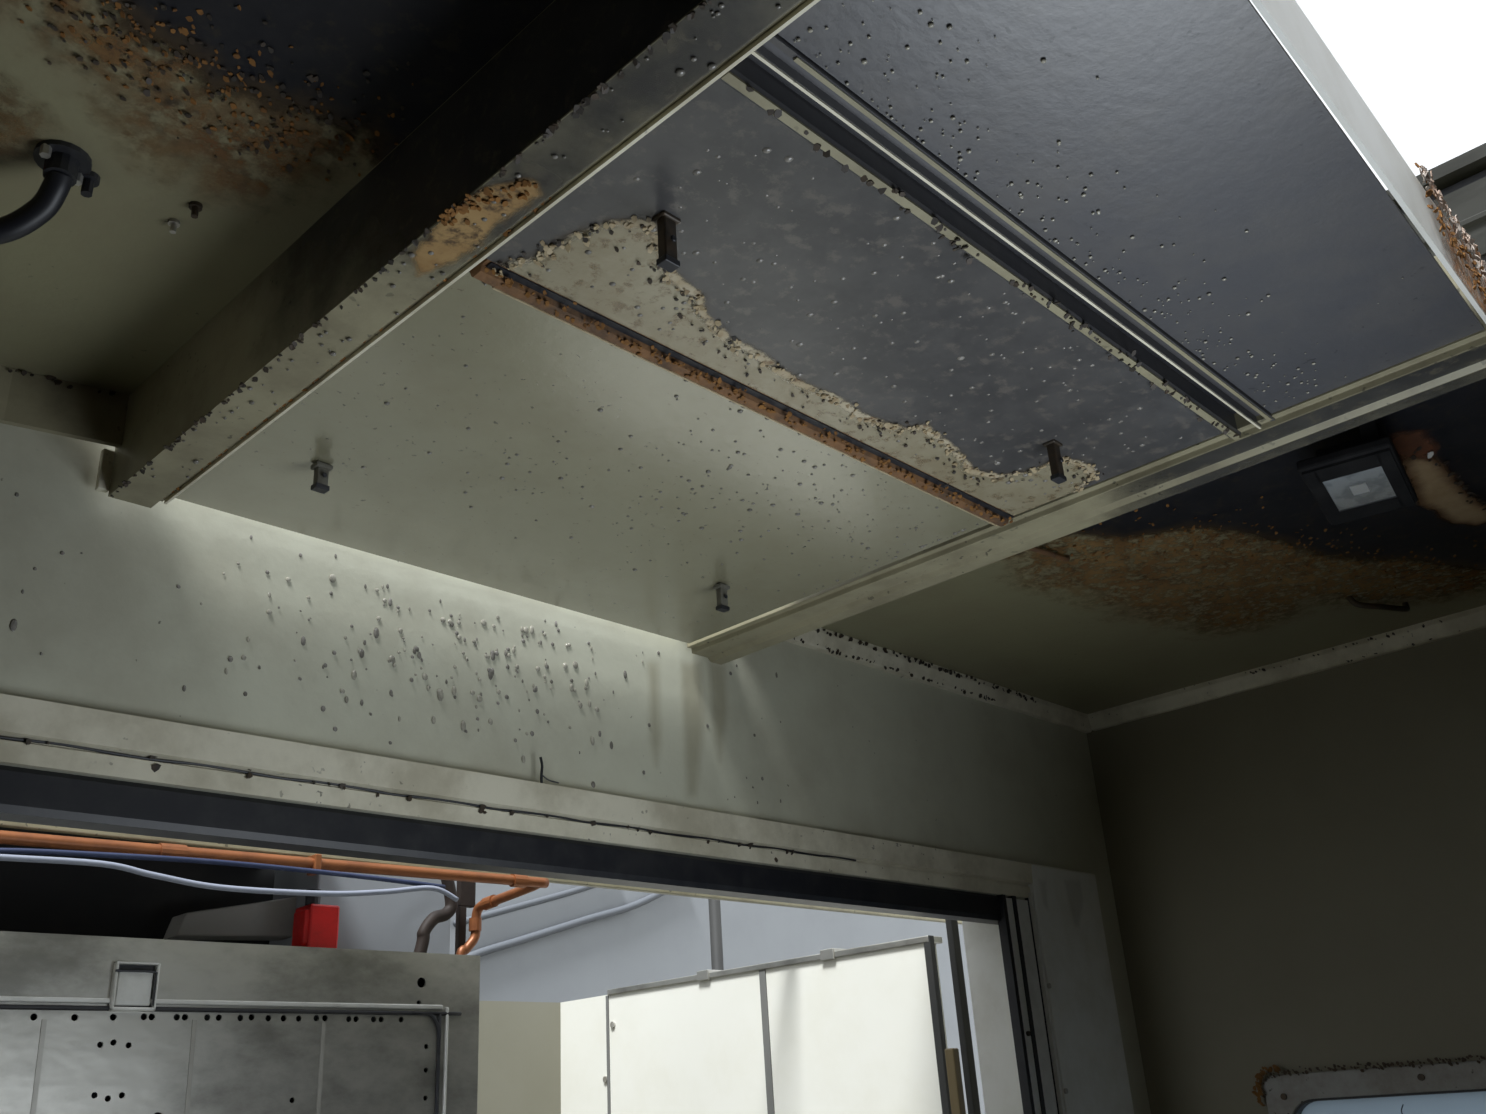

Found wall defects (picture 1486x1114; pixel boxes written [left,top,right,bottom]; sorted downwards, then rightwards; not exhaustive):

peeling [451,0,712,218]
peeling [804,130,911,214]
peeling [931,216,980,265]
rust [1414,163,1486,312]
peeling [163,227,433,451]
peeling [1009,280,1241,438]
peeling [1390,431,1486,526]